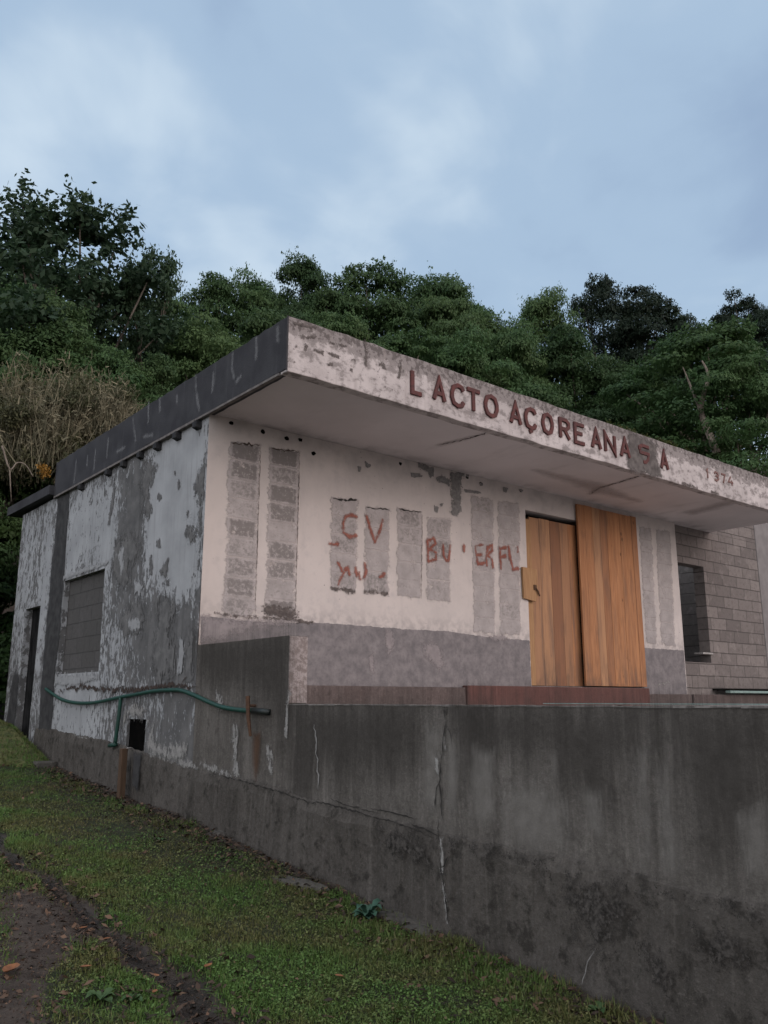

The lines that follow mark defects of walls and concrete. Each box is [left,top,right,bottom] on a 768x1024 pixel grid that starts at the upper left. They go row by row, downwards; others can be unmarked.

peeling [54,670,99,687]
peeling [63,455,195,688]
peeling [184,452,206,594]
peeling [214,604,313,624]
peeling [331,586,388,596]
crack [213,708,452,924]